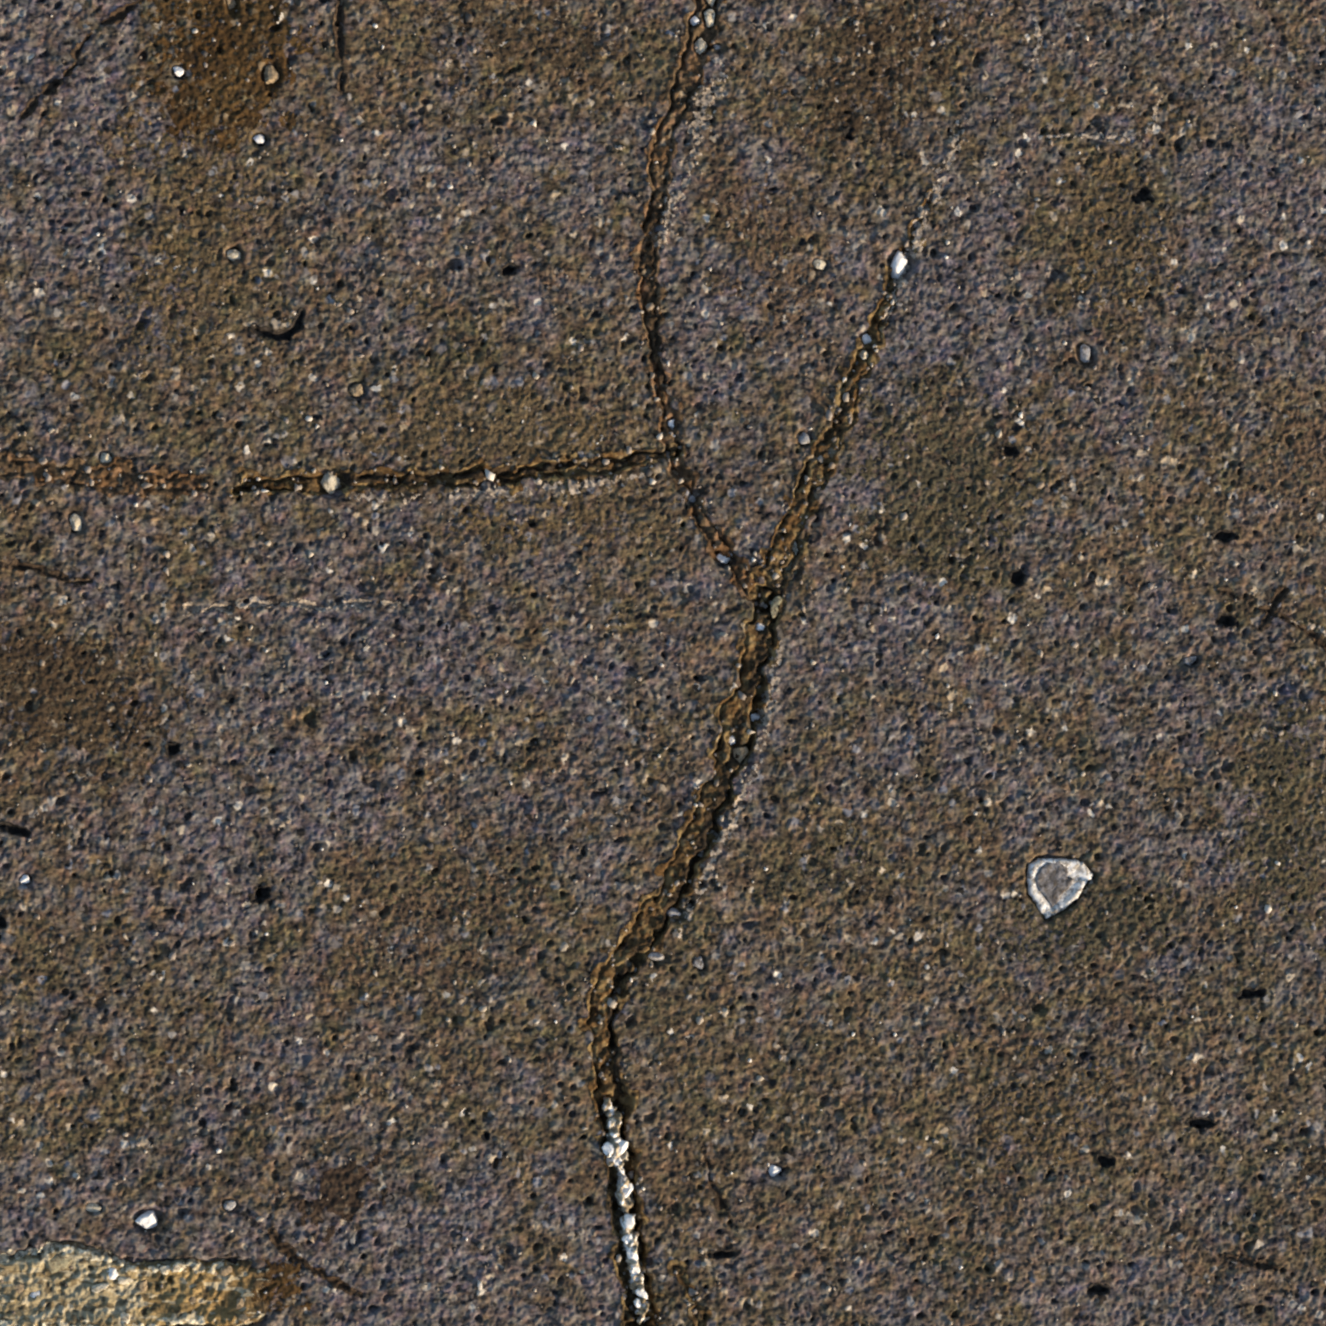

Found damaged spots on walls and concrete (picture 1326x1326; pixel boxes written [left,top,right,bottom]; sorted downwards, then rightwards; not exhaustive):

spalling [0,1241,312,1326]
crack [0,0,969,1326]